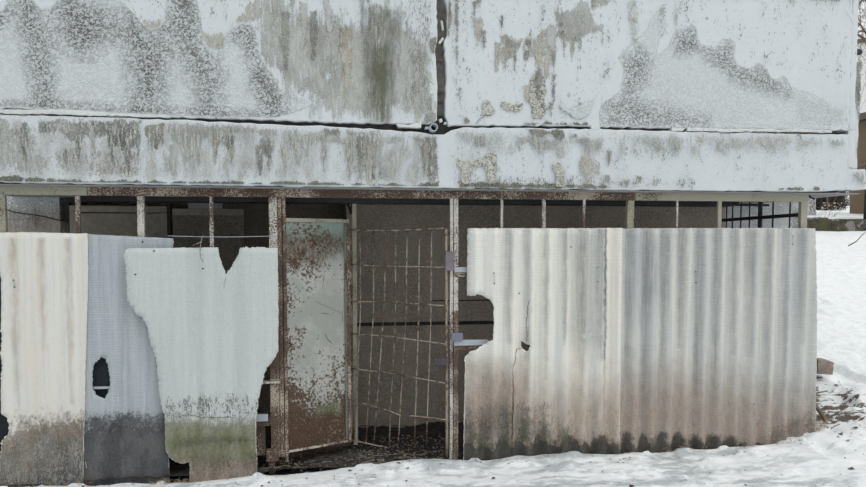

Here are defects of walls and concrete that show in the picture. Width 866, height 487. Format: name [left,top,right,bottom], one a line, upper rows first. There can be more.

water stain [18,0,51,106]
water stain [60,0,108,49]
water stain [125,16,161,112]
water stain [174,0,280,110]
water stain [271,0,318,71]
water stain [329,0,410,119]
water stain [454,0,582,80]
water stain [107,123,202,179]
water stain [415,136,440,182]
crack [511,301,530,452]
water stain [0,393,258,487]
water stain [464,432,740,461]